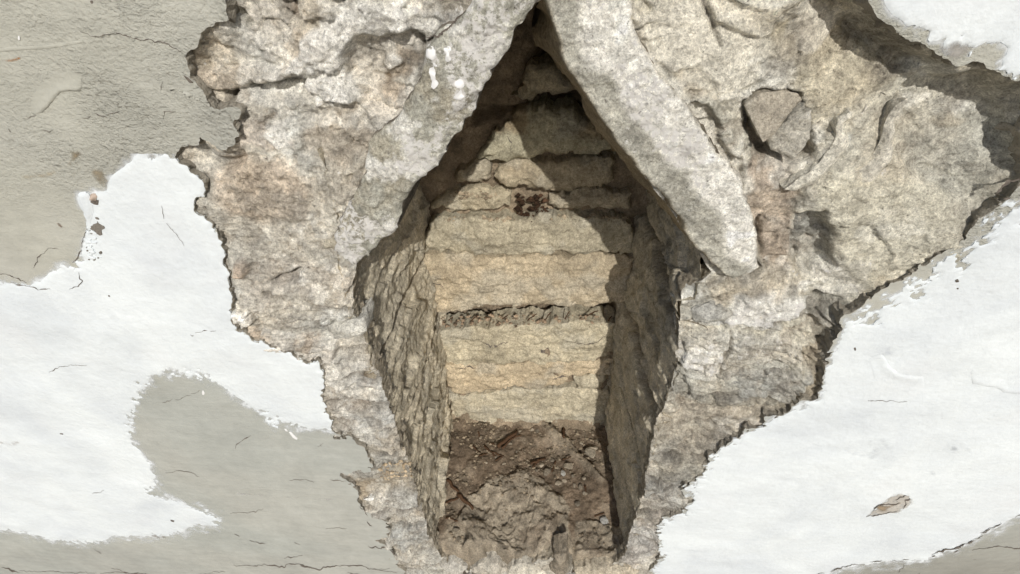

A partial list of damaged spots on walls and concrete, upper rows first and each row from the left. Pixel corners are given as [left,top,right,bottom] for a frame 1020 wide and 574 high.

peeling [883,0,1020,80]
peeling [0,154,336,546]
crack [209,507,396,574]
peeling [651,200,1020,574]